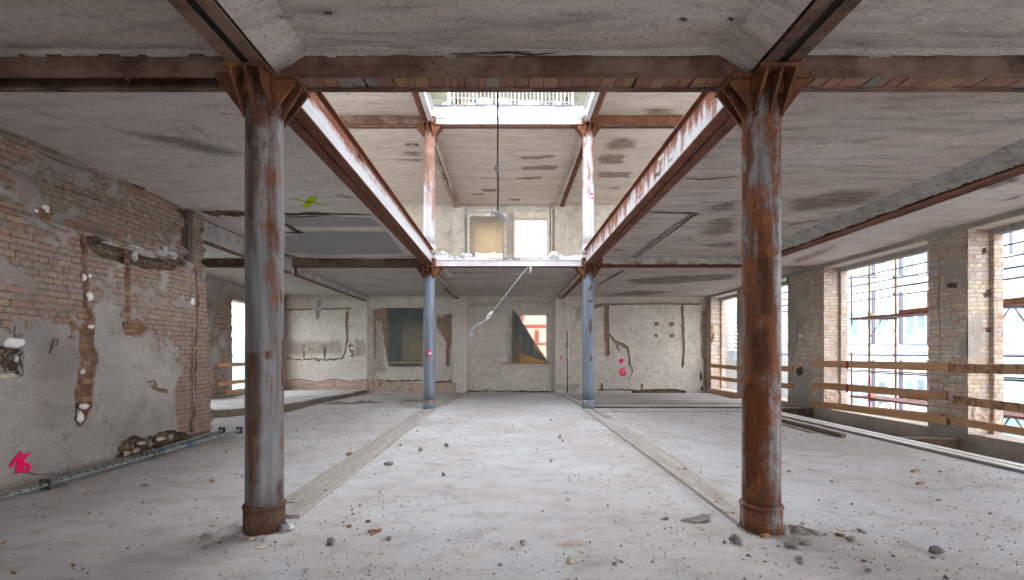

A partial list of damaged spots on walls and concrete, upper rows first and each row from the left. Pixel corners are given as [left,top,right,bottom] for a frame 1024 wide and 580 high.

spalling [0,338,25,380]
spalling [122,318,148,337]
spalling [373,308,388,357]
spalling [436,314,456,366]
peeling [76,403,90,423]
rust [247,311,284,507]
rust [742,329,771,494]
spalling [116,430,192,458]